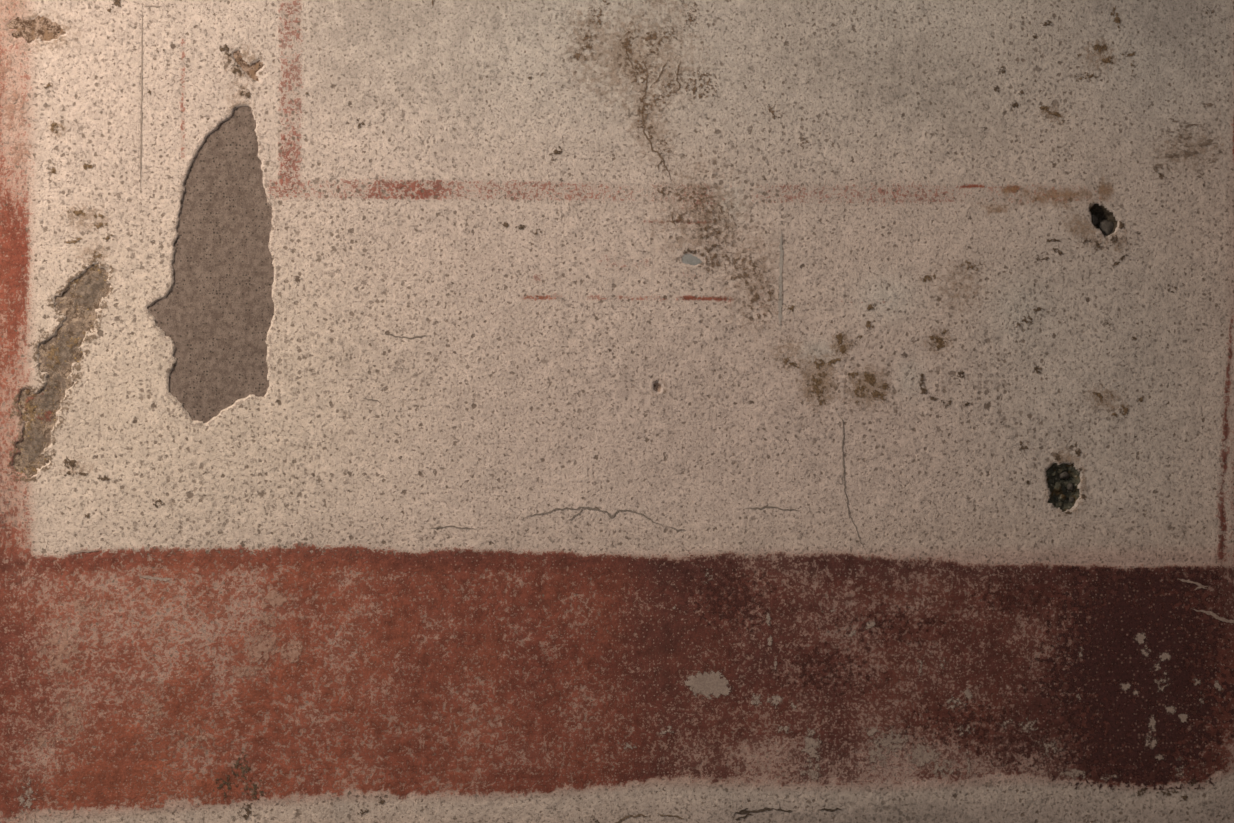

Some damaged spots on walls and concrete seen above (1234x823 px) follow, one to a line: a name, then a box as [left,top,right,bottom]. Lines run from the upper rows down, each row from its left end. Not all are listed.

crack [625,48,681,179]
flaking render [146,44,282,428]
spalling [1081,221,1128,268]
crack [427,523,474,531]
crack [521,507,686,531]
crack [750,504,800,512]
peeling [684,670,731,699]